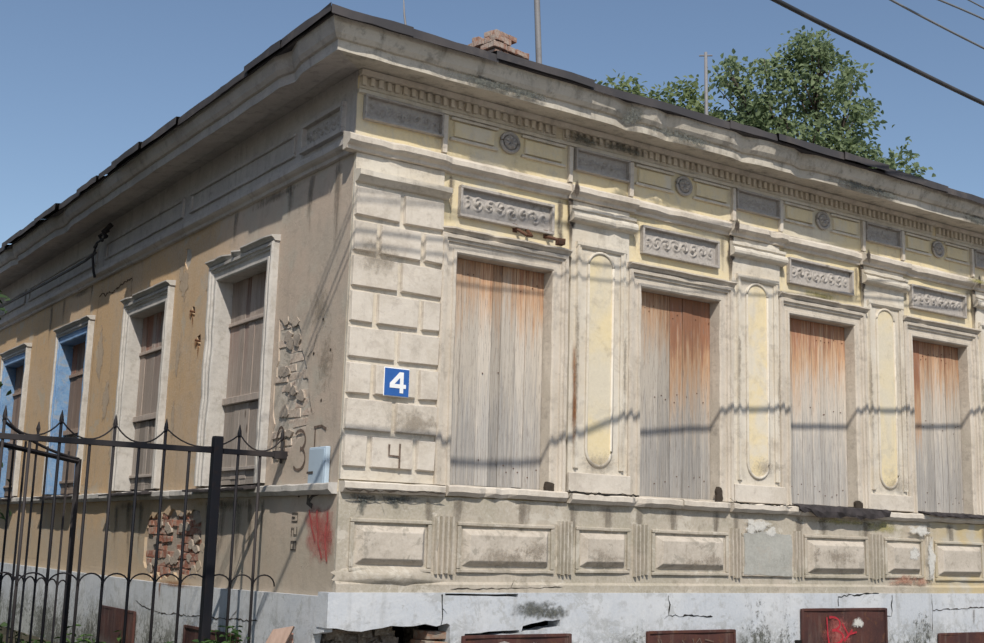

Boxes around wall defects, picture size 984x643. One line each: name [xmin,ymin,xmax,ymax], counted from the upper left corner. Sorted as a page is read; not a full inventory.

flaking render [272,316,311,471]
flaking render [146,506,204,579]
peeling [746,519,776,537]
crack [441,581,557,624]